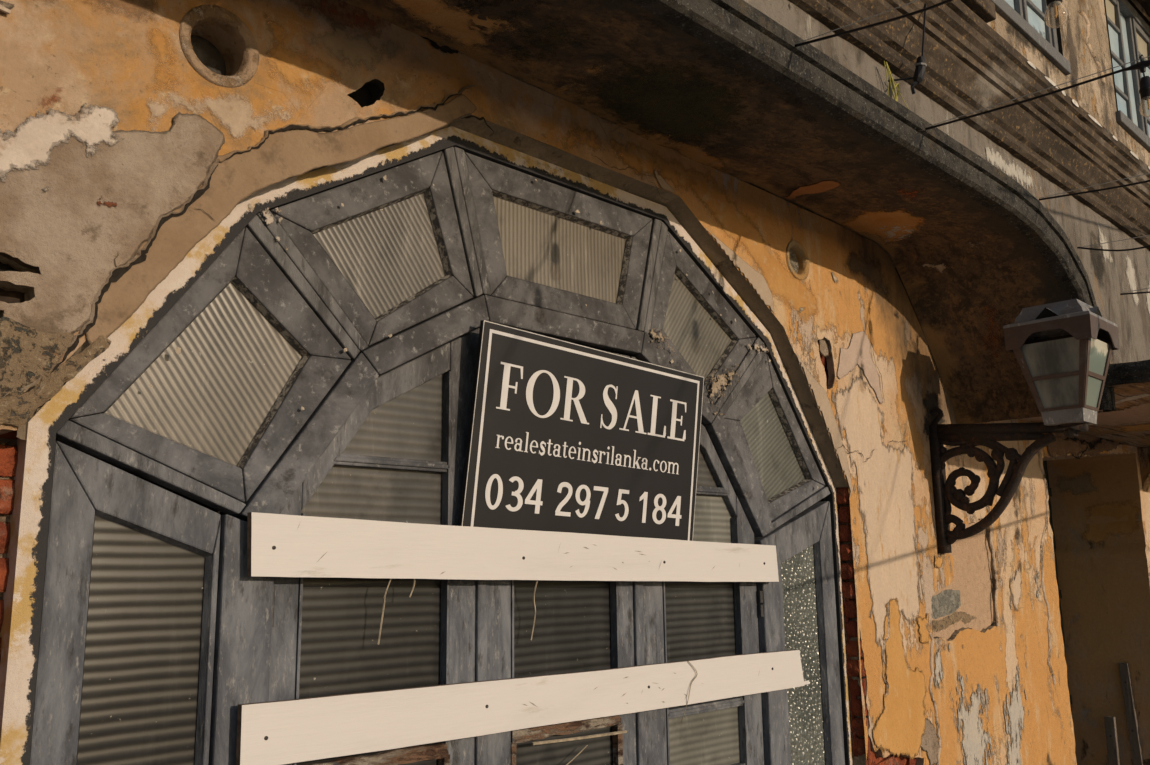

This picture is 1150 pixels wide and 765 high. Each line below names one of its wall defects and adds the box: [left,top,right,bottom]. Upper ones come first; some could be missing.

water stain [98,0,155,19]
crack [421,36,459,54]
water stain [462,0,588,61]
water stain [1008,23,1061,73]
water stain [577,48,769,149]
water stain [986,147,1033,189]
flaking render [0,93,477,397]
crack [0,85,494,415]
flaking render [706,228,776,315]
peeling [1096,393,1150,426]
peeling [796,331,997,765]
peeling [1003,665,1027,765]